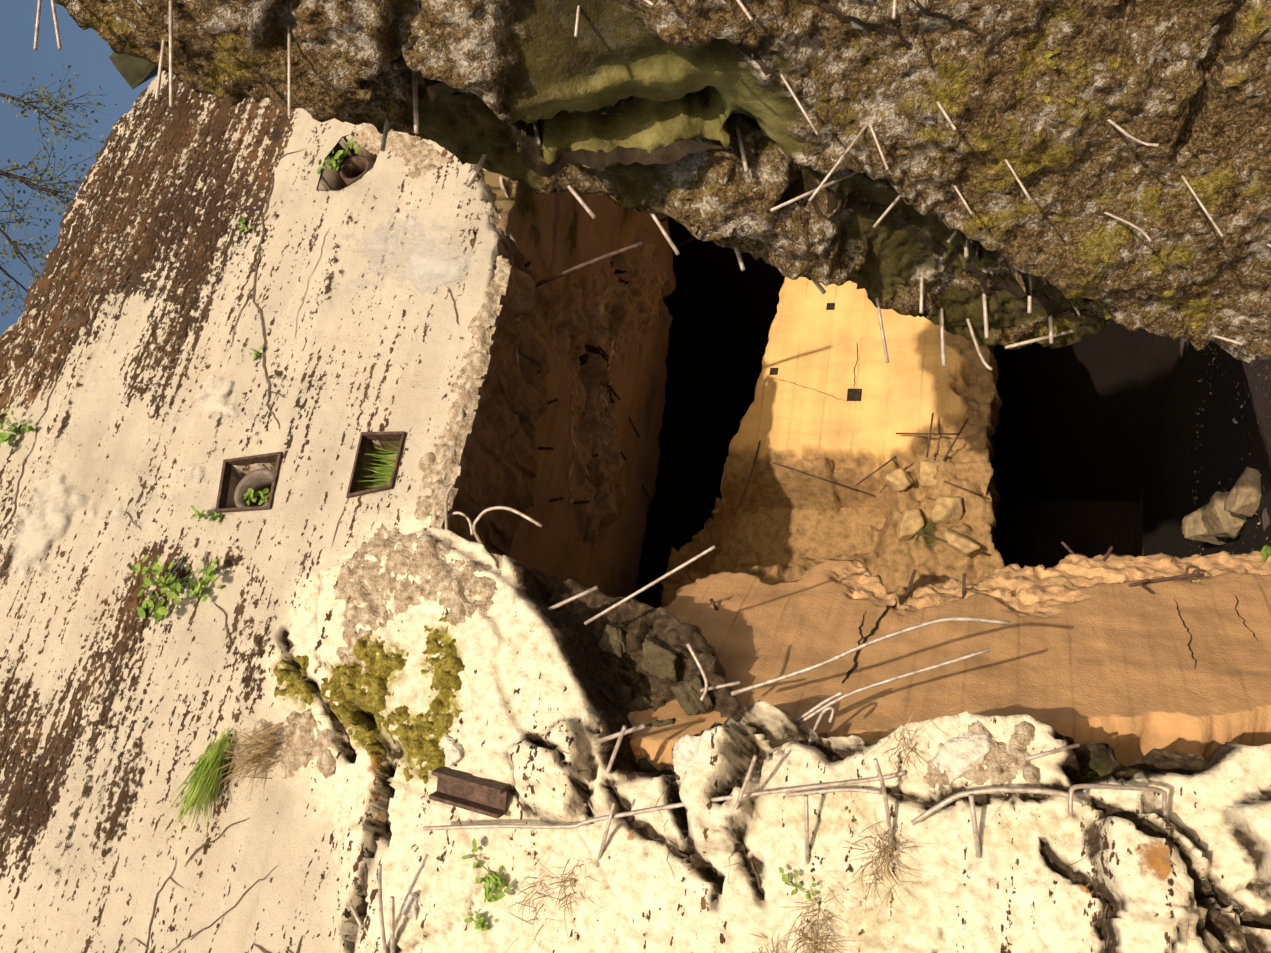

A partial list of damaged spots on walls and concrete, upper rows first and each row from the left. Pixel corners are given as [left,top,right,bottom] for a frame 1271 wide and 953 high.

damp [0,75,281,477]
damp [319,244,344,300]
spalling [966,292,993,371]
damp [0,517,249,887]
damp [242,609,276,683]
crack [269,660,396,771]
spalling [584,545,716,625]
spalling [686,617,1011,701]
spalling [795,648,990,745]
crack [1174,599,1197,667]
crack [526,736,760,904]
crack [1090,798,1253,953]